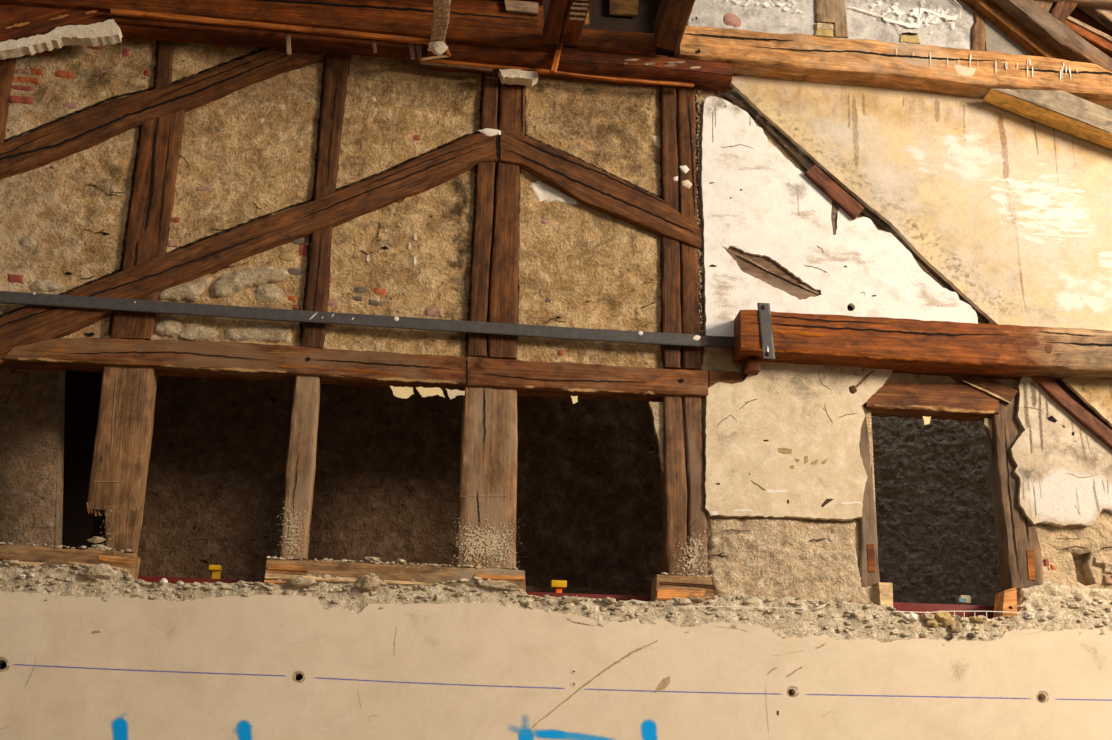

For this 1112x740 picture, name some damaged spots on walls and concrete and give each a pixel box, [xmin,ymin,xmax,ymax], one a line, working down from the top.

damp [699,75,1112,327]
spalling [724,247,821,300]
spalling [0,559,1112,646]